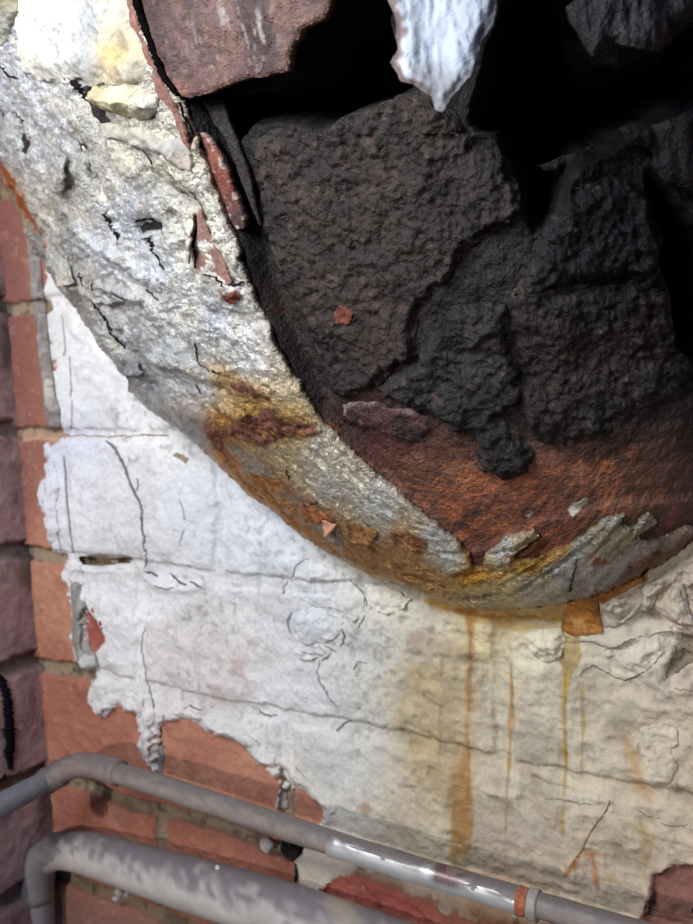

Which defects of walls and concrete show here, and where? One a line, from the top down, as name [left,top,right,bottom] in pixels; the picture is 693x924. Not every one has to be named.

peeling [388,0,497,112]
peeling [565,0,693,58]
crack [102,214,164,270]
peeling [146,163,234,286]
crack [77,273,130,392]
crack [194,342,220,394]
crack [56,314,203,590]
corrosion [204,380,323,467]
corrosion [389,529,426,552]
corrosion [427,573,648,722]
peeling [169,709,336,815]
corrosion [514,885,529,918]